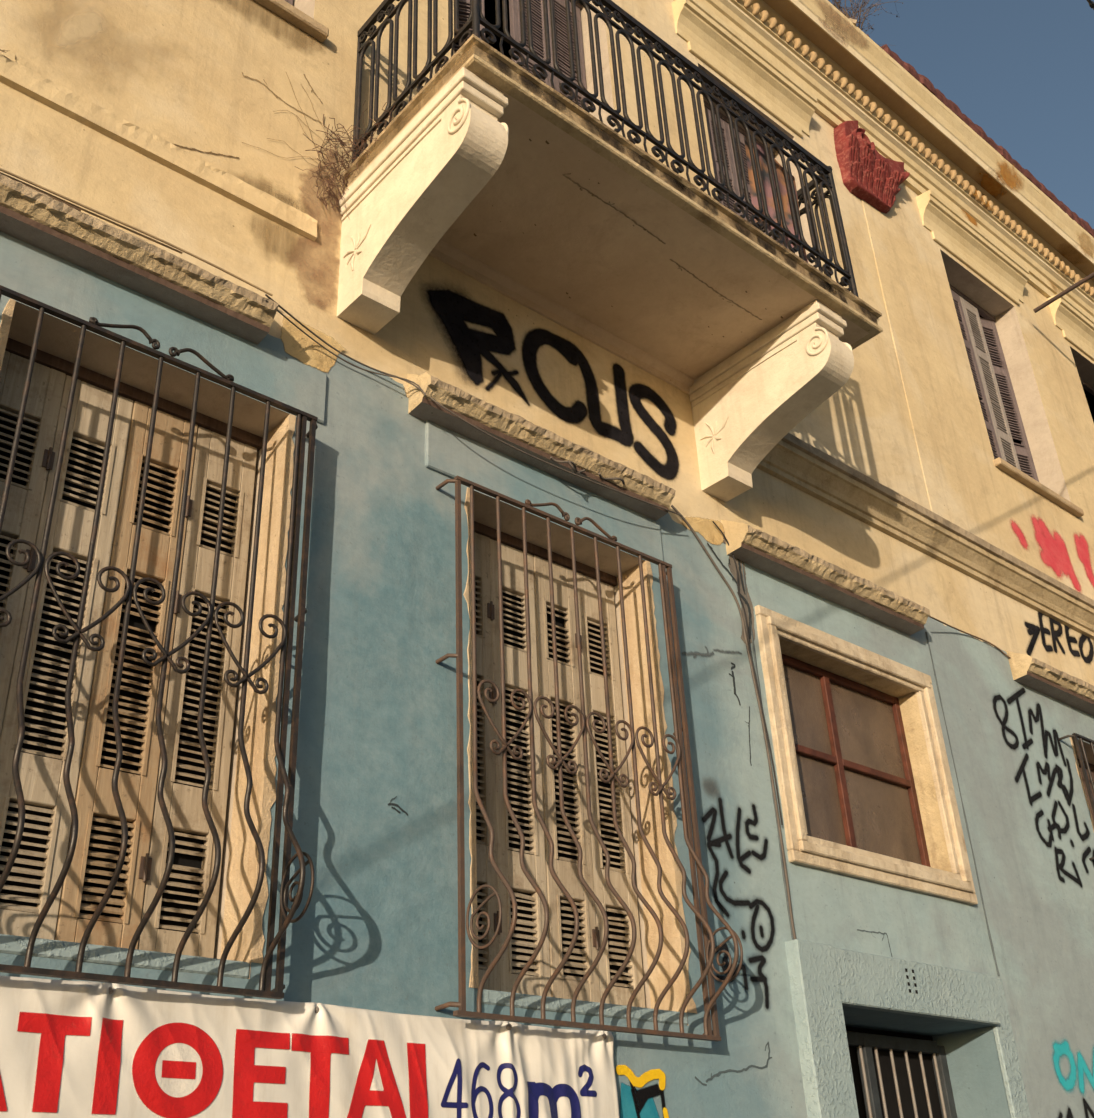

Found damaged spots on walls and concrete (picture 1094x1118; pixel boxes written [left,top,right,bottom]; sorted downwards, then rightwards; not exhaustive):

crack [173,144,239,158]
water stain [243,179,307,213]
rust [974,163,1021,208]
peeling [281,316,346,372]